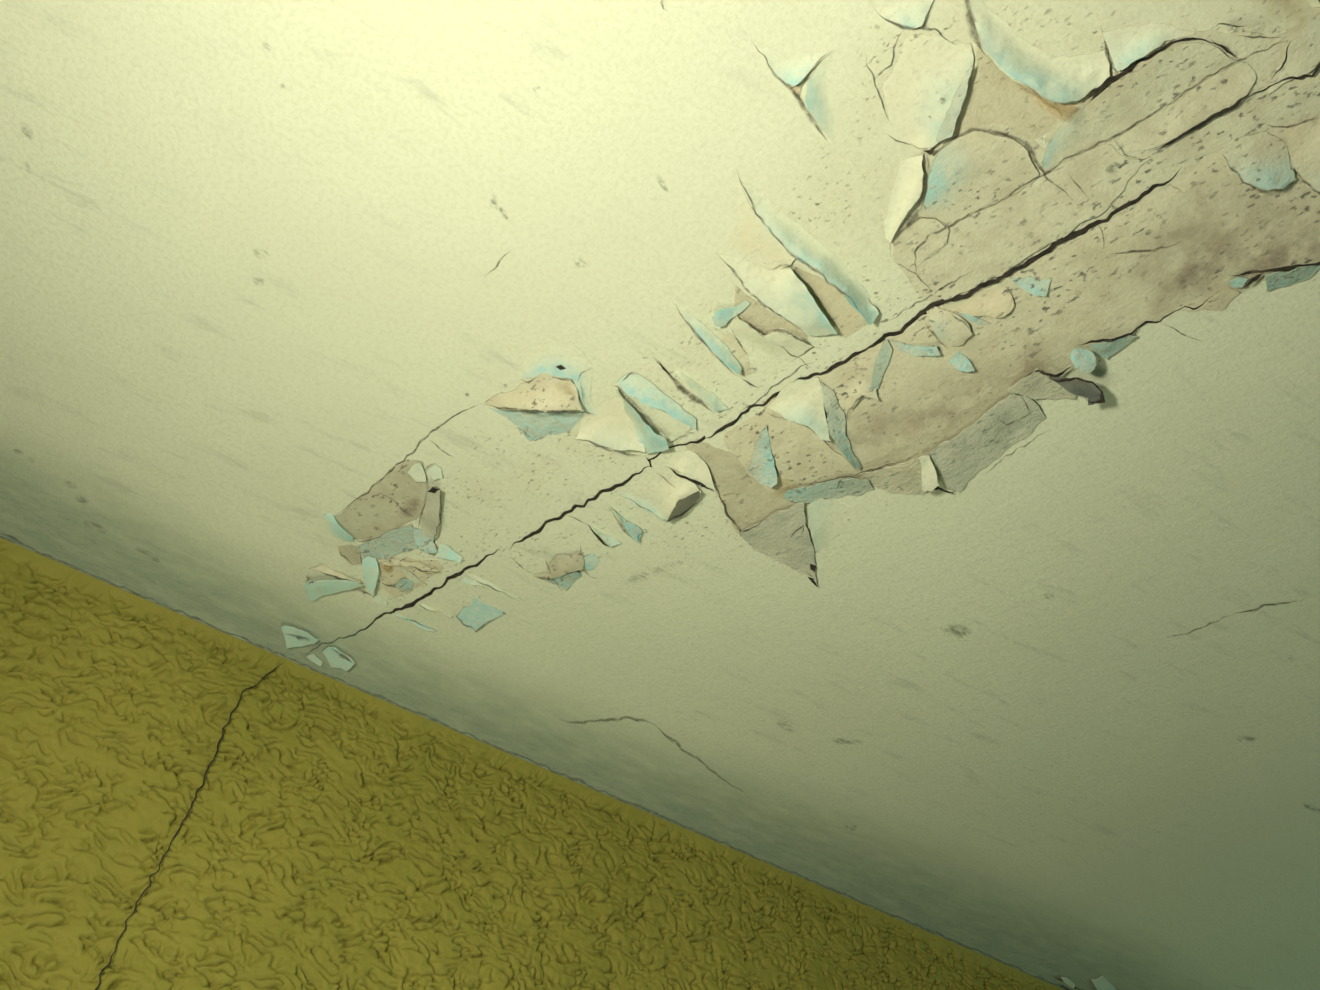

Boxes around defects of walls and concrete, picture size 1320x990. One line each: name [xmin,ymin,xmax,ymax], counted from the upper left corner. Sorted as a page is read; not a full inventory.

crack [1153,90,1253,151]
peeling [305,0,1320,632]
crack [0,166,1182,990]
peeling [281,625,355,671]
crack [1173,601,1295,636]